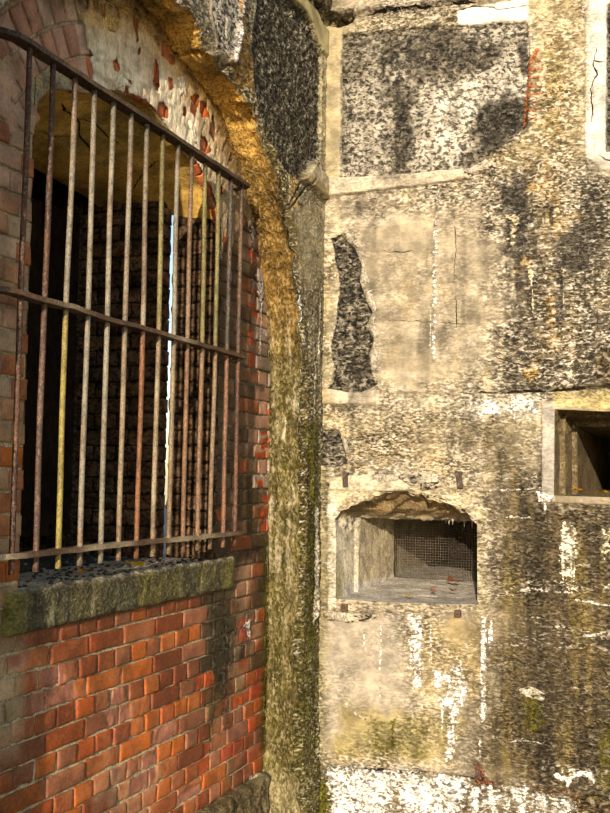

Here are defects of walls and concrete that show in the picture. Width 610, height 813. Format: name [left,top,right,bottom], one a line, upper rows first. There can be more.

crack [35,103,121,151]
peeling [79,0,261,283]
spalling [464,160,497,179]
rust [524,48,544,126]
crack [590,47,603,122]
spalling [233,279,261,368]
leakage [314,277,322,408]
peeling [329,234,379,392]
leakage [312,506,320,625]
efflorescence [405,613,468,762]
efflorescence [480,616,493,723]
efflorescence [325,765,595,813]